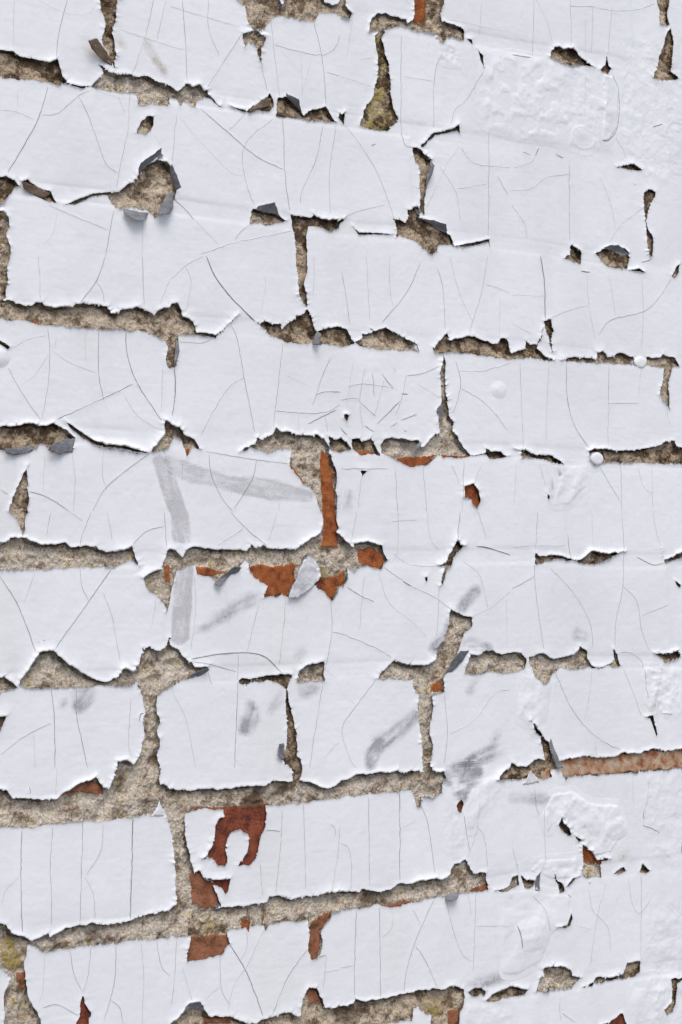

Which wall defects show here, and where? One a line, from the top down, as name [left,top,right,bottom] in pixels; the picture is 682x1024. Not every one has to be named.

peeling [0,0,221,135]
peeling [360,0,472,131]
peeling [0,148,221,368]
peeling [250,202,415,351]
crack [120,0,587,546]
crack [8,332,176,425]
peeling [144,319,633,609]
crack [193,601,286,767]
crack [310,464,663,765]
crack [127,822,135,919]
peeling [0,610,640,1024]
crack [104,910,392,1022]